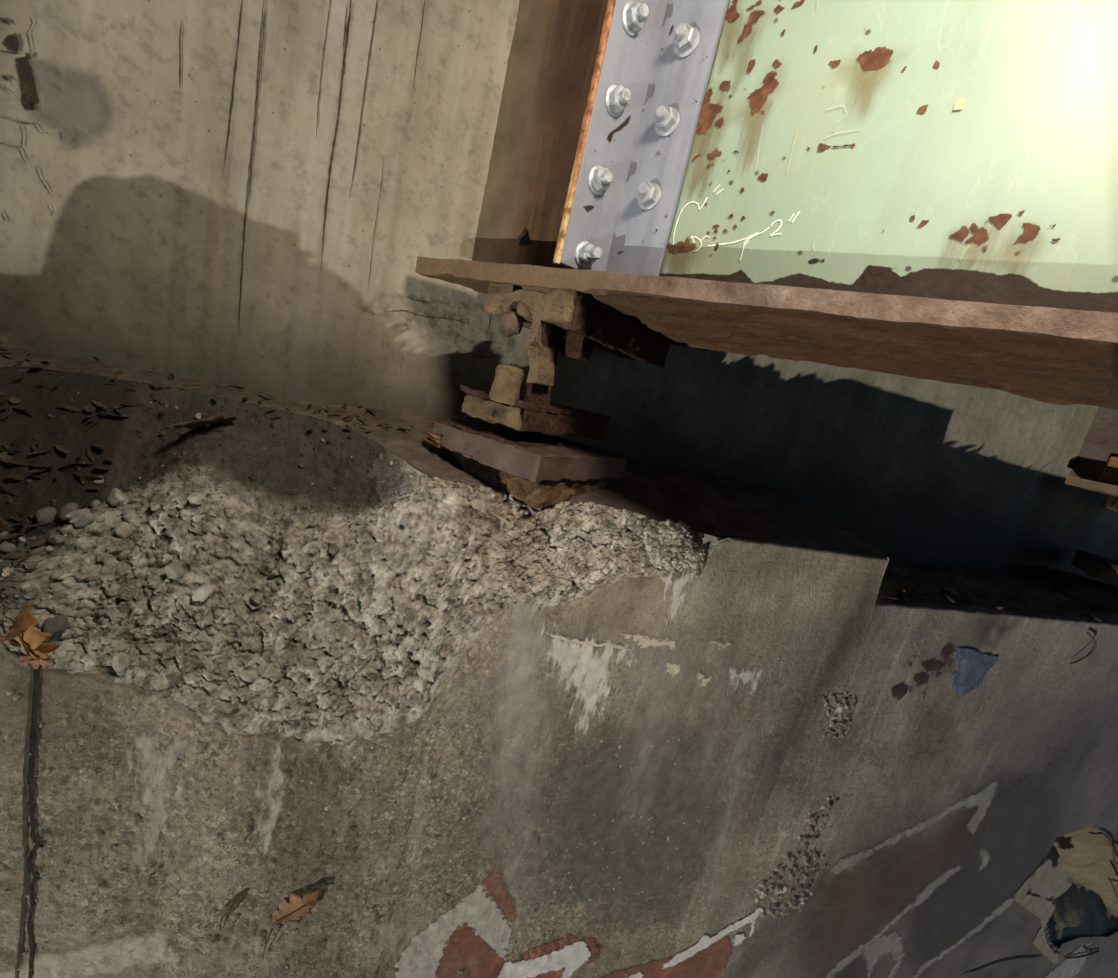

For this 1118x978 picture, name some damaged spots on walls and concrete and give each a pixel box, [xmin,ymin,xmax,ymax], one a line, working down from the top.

crack [1,15,33,54]
rust [725,0,805,73]
rust [857,47,893,108]
crack [0,86,62,217]
rust [692,59,782,188]
rust [807,143,855,151]
spalling [0,366,729,746]
rust [892,644,954,700]
spalling [821,691,856,740]
crack [15,664,44,978]
spalling [755,792,840,918]